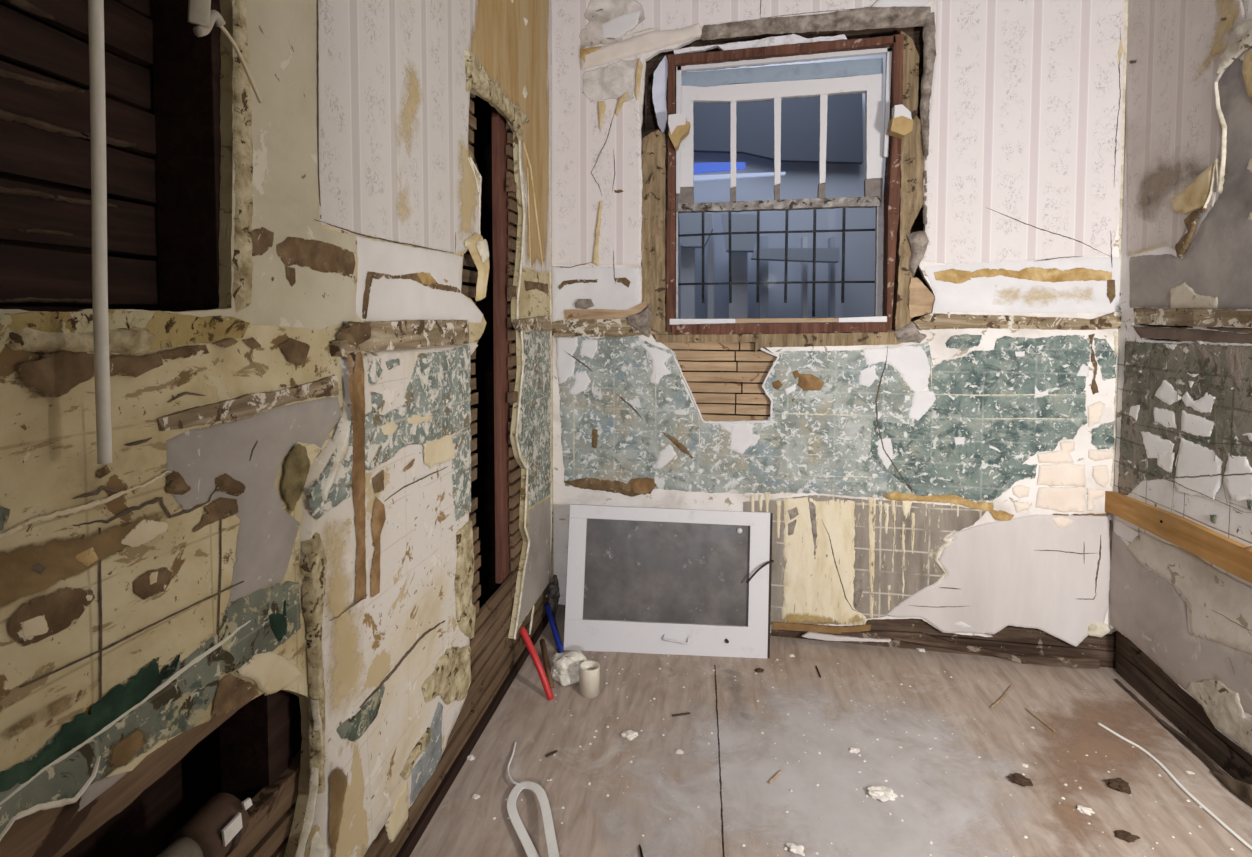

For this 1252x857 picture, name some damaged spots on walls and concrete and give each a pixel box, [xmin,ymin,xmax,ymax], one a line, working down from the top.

flaking render [579,0,645,48]
crack [985,207,1164,263]
flaking render [1119,0,1252,310]
peeling [364,49,1252,857]
flaking render [0,396,385,857]